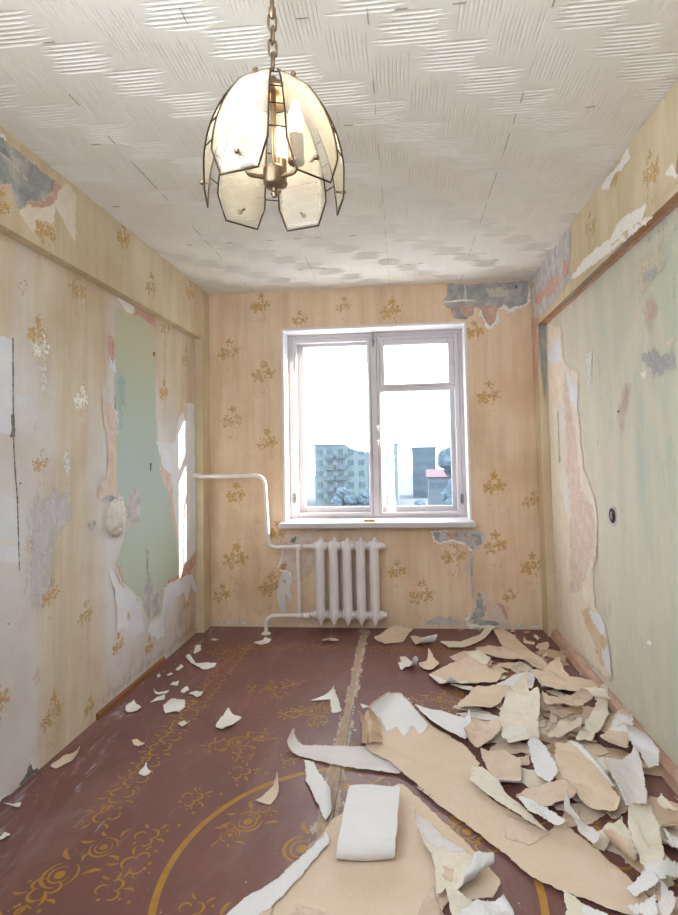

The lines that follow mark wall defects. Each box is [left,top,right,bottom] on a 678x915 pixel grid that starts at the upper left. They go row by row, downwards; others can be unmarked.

spalling [0,133,61,210]
peeling [117,297,134,314]
spalling [443,260,568,330]
peeling [532,192,678,400]
spalling [430,529,486,551]
spalling [465,587,509,629]